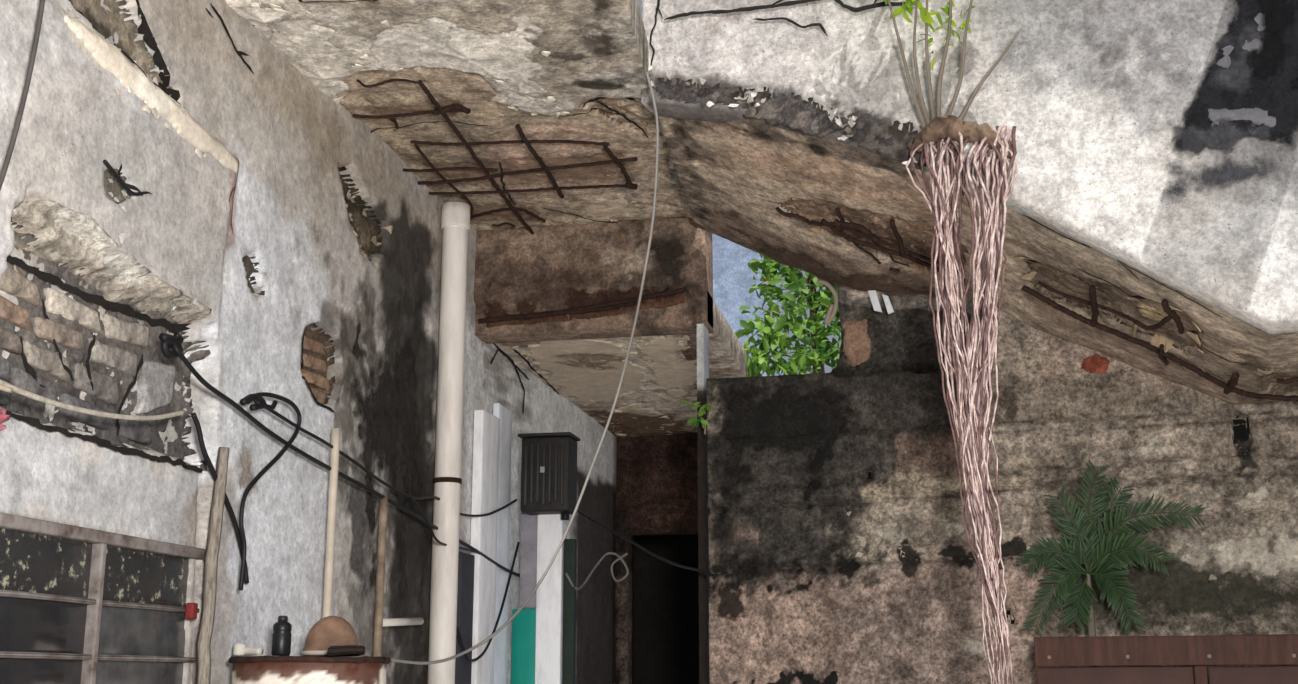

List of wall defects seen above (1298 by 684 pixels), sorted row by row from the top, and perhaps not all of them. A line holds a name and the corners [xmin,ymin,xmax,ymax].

spalling [68,0,188,112]
crack [206,4,255,74]
spalling [226,0,692,234]
crack [649,0,914,66]
spalling [648,66,927,167]
leakage [1166,0,1298,197]
flaking render [0,200,212,473]
flaking render [301,323,335,413]
leakage [345,323,422,603]
leakage [711,561,756,621]
leakage [767,522,921,594]
leakage [997,535,1027,569]